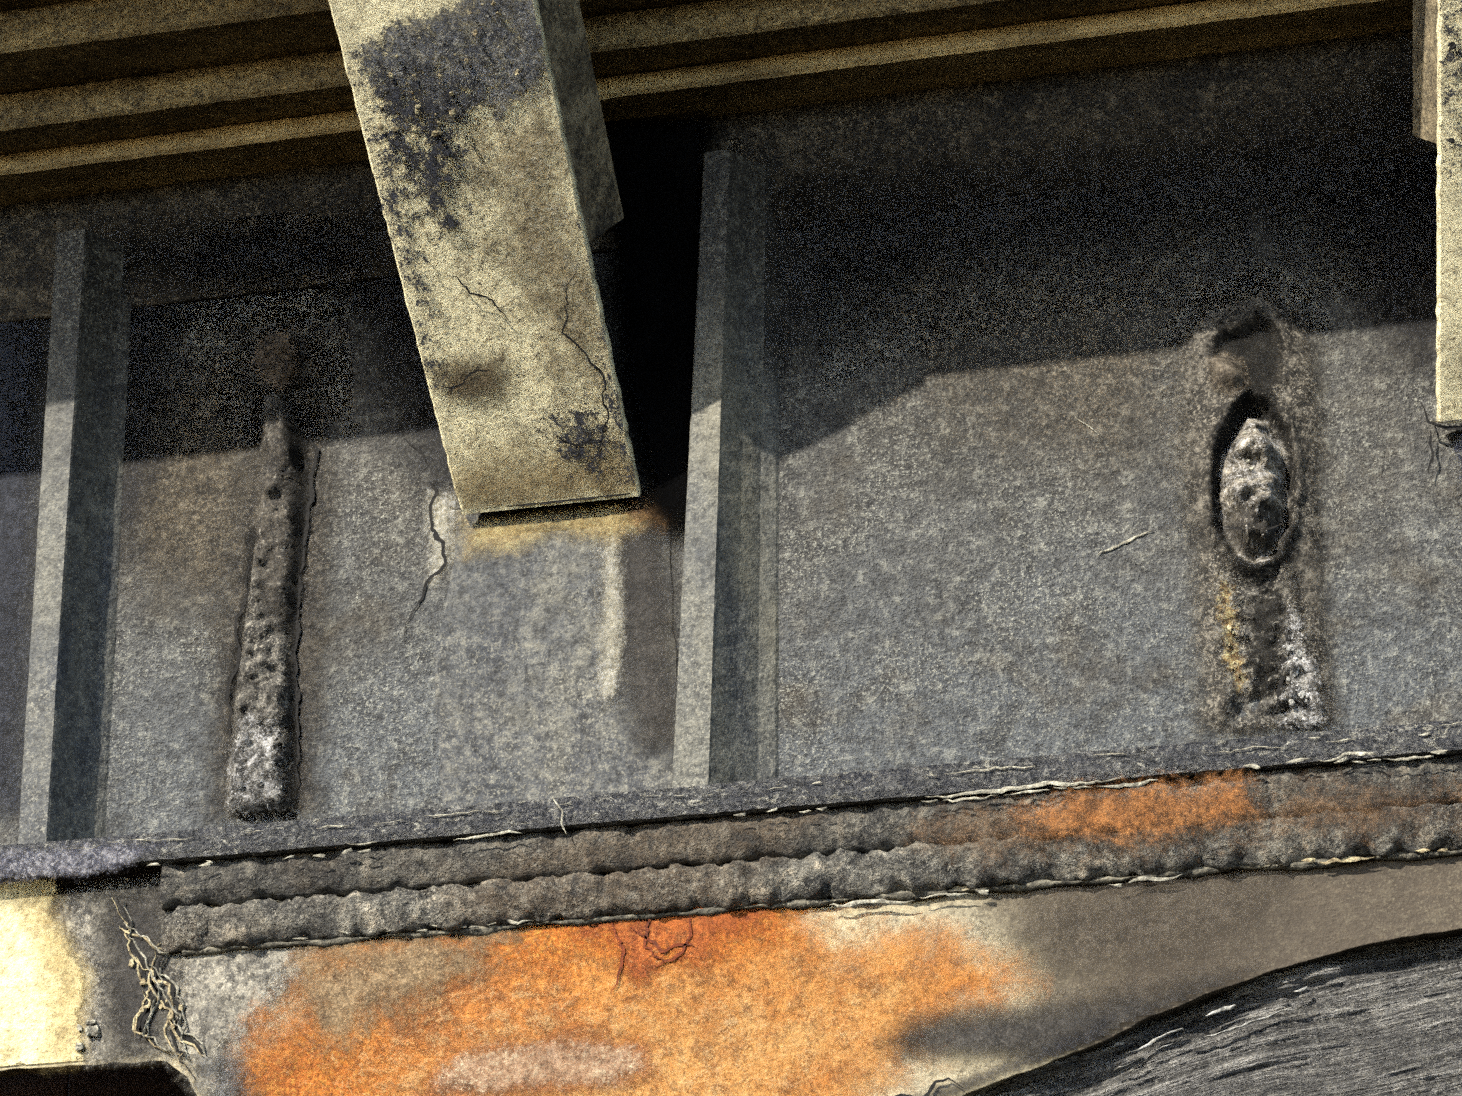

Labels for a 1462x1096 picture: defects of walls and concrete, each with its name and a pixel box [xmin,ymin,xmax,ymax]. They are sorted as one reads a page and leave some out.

crack [363,64,635,640]
crack [1421,403,1462,474]
corrosion [1020,785,1248,833]
corrosion [243,903,1010,1096]